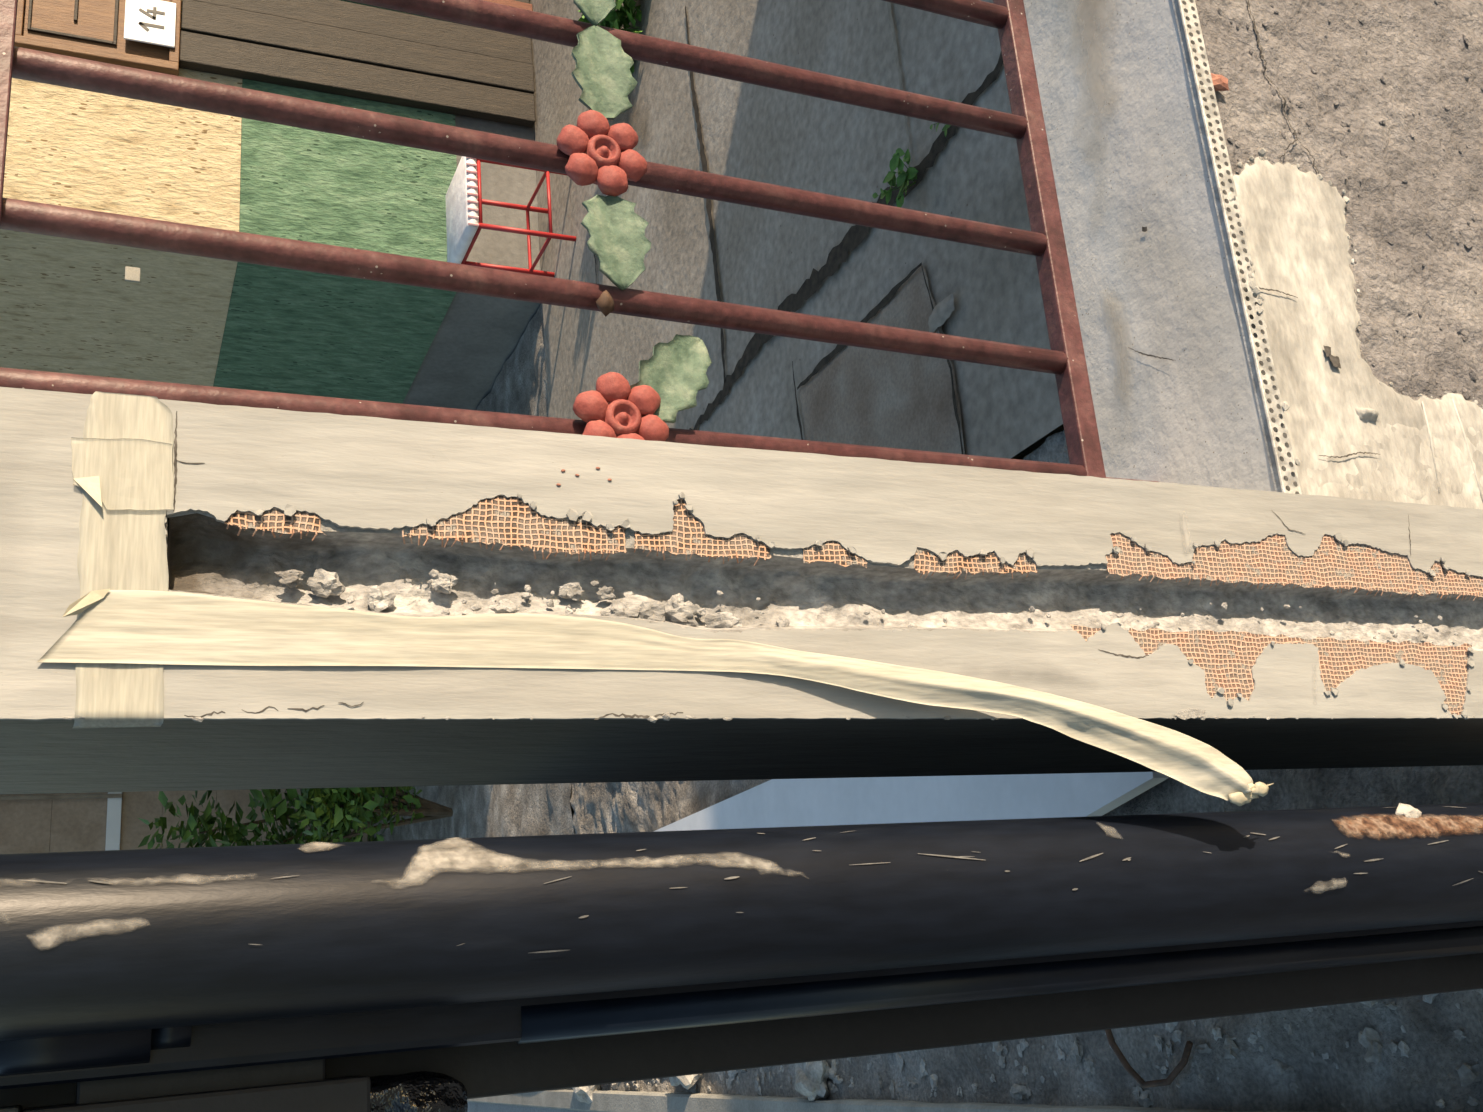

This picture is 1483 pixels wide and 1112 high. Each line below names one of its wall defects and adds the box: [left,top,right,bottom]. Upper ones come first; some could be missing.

spalling [1210,73,1229,91]
crack [685,6,1003,430]
spalling [1324,346,1341,368]
spalling [224,504,326,541]
spalling [399,492,775,566]
spalling [803,540,867,568]
spalling [914,548,1038,579]
spalling [1105,532,1483,601]
spalling [1070,624,1106,641]
spalling [1129,628,1475,720]